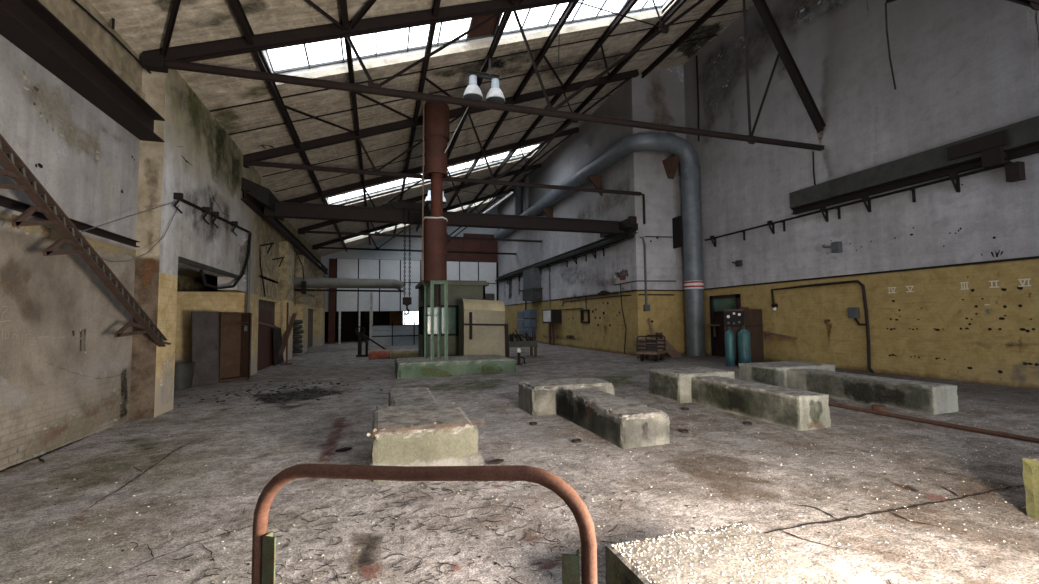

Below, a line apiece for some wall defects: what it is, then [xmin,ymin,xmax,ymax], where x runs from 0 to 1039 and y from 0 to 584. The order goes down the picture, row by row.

crack [764,485,1024,549]